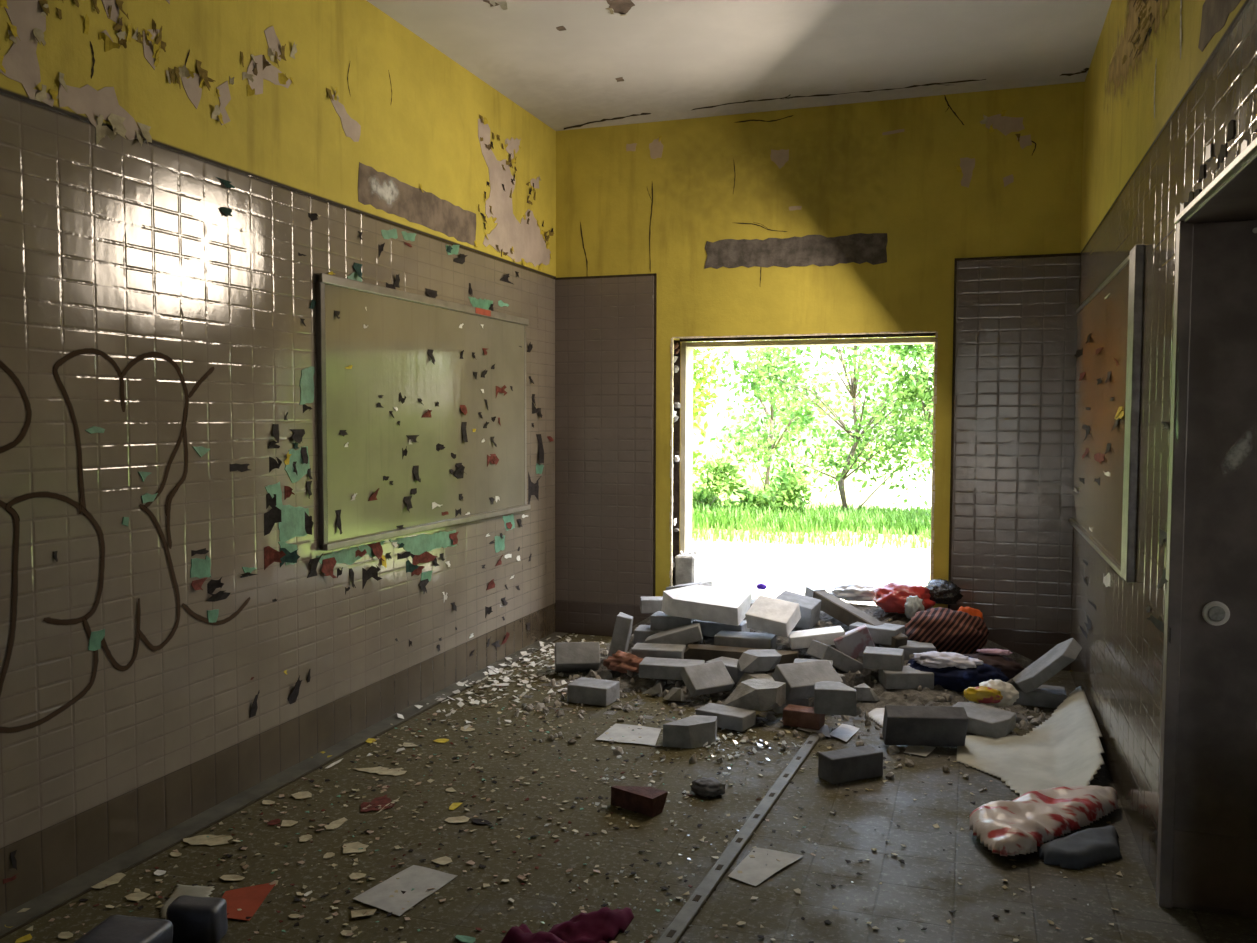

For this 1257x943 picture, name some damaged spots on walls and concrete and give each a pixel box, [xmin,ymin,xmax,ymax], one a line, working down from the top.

peeling [605,0,635,16]
peeling [0,0,297,147]
peeling [326,88,361,142]
crack [692,79,986,125]
flaking render [358,115,554,284]
peeling [704,233,888,269]
peeling [468,283,509,328]
peeling [460,348,513,467]
peeling [230,463,250,472]
peeling [240,366,470,595]
peeling [455,376,554,656]
peeling [190,548,230,623]